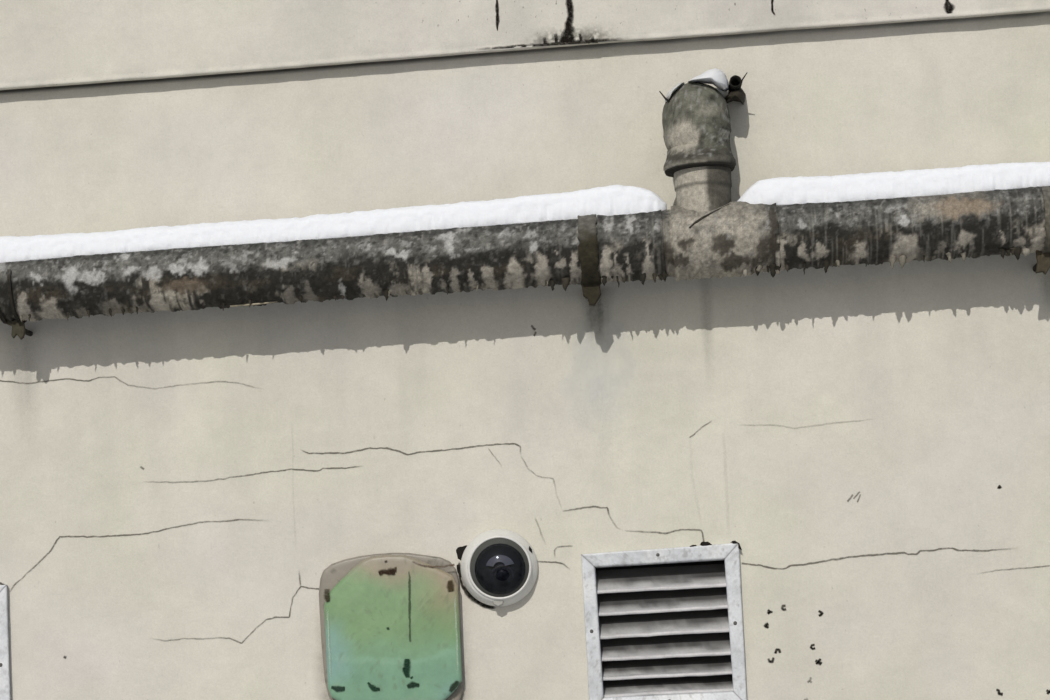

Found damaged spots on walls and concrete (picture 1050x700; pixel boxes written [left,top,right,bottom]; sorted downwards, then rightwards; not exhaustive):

crack [563,0,574,42]
crack [944,0,954,14]
crack [0,376,115,384]
crack [195,443,519,482]
crack [0,519,243,586]
crack [651,529,705,542]
crack [742,548,1046,570]
crack [221,578,319,644]